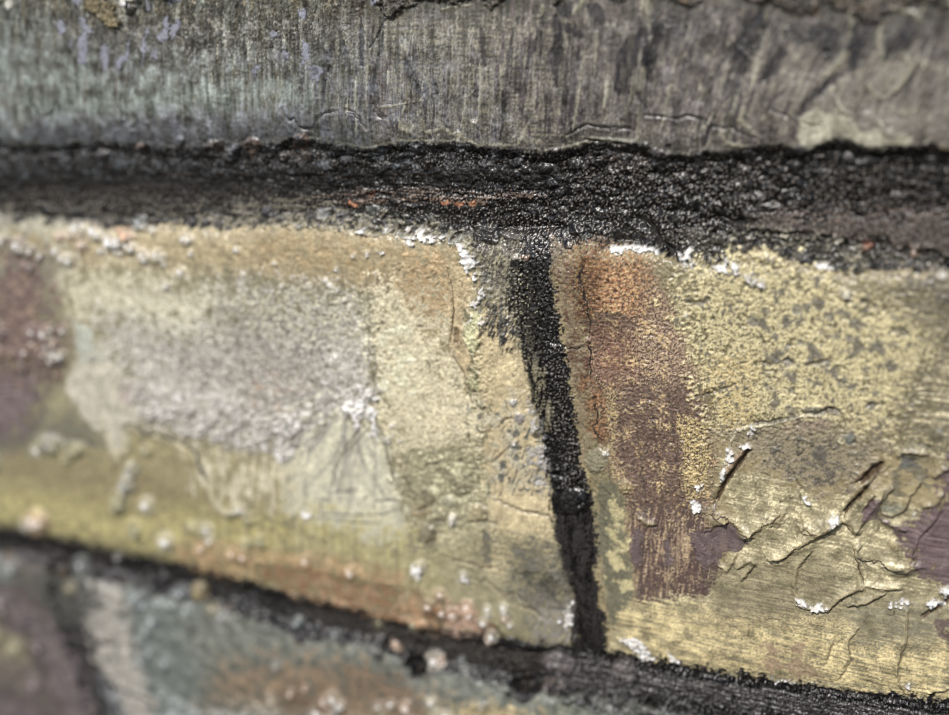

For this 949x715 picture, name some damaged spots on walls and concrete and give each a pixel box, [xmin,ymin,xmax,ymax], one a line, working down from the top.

rust [569,240,654,443]
water stain [131,382,302,463]
water stain [338,386,382,438]
peeling [629,527,645,567]
peeling [688,524,748,572]
crack [703,454,781,539]
crack [776,462,943,613]
peeling [862,451,949,587]
crack [798,623,949,715]